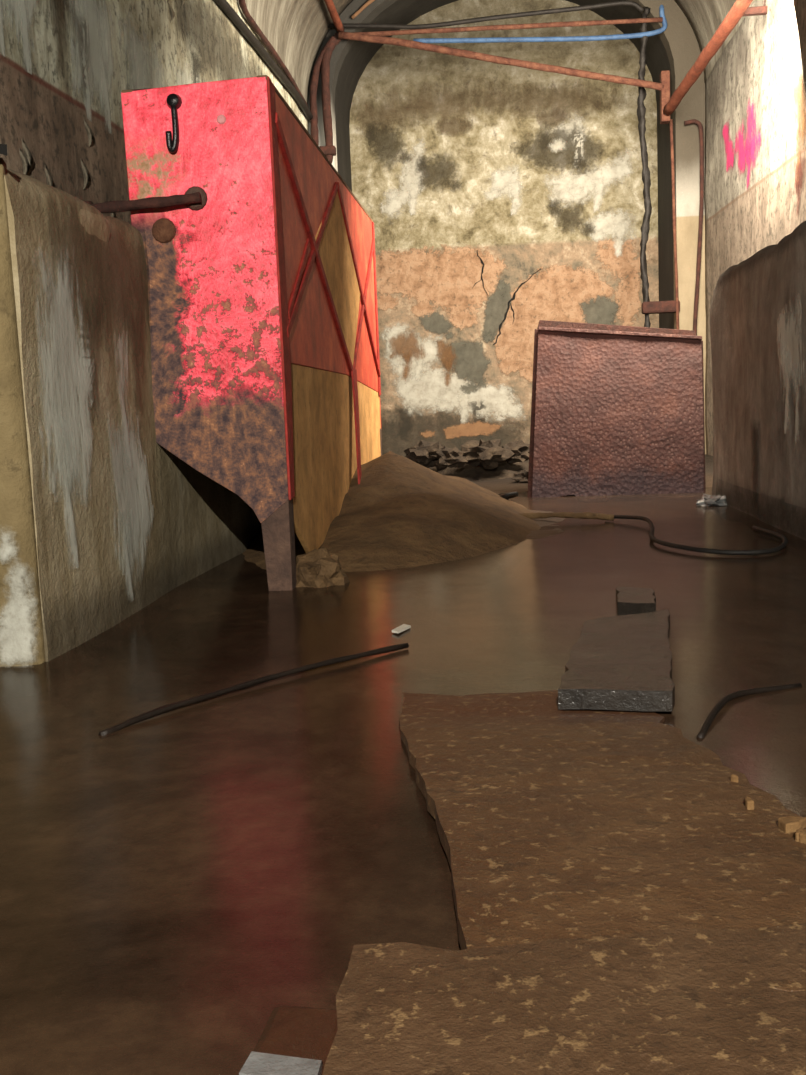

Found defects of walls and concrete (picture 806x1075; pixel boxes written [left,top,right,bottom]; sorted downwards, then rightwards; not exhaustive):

damp [71,0,164,132]
damp [175,0,261,85]
damp [367,125,462,217]
damp [485,167,520,215]
damp [516,118,633,257]
crack [473,250,541,345]
peeling [375,238,641,394]
damp [381,324,525,457]
flaking render [421,421,501,439]